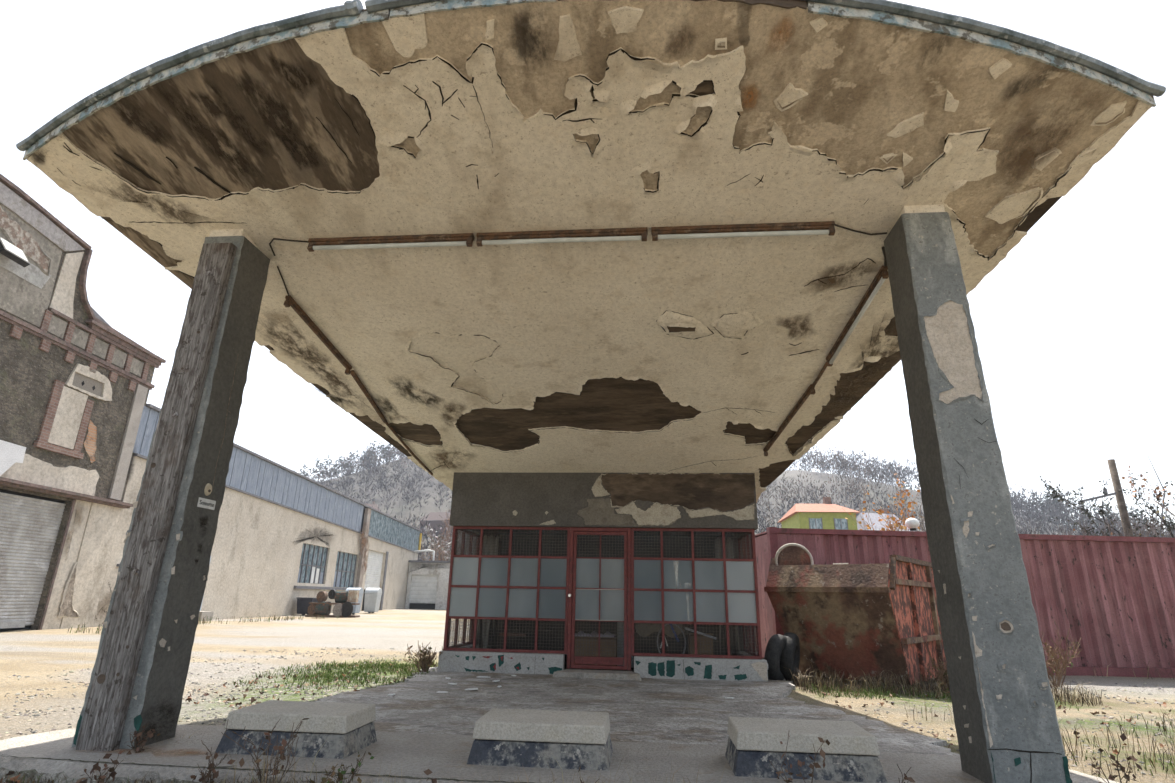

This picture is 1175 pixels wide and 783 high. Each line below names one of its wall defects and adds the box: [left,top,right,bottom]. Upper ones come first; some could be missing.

spalling [62,38,428,201]
peeling [345,0,1138,260]
peeling [920,299,984,405]
spalling [350,411,444,457]
spalling [453,374,701,453]
spalling [577,317,900,527]
peeling [455,655,530,672]
peeling [636,660,768,681]